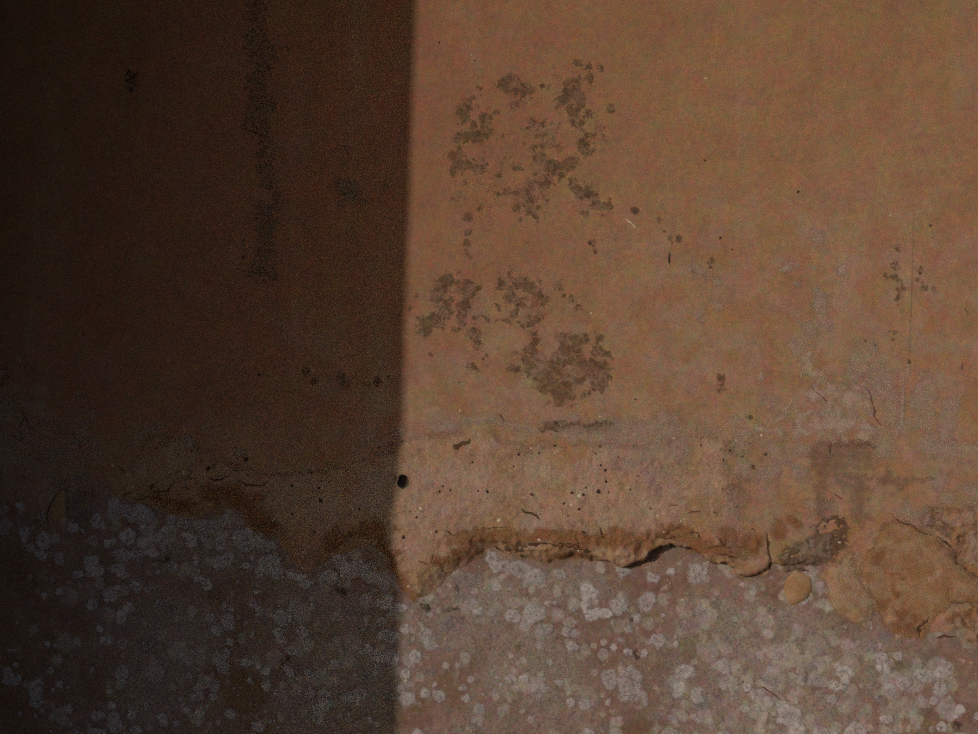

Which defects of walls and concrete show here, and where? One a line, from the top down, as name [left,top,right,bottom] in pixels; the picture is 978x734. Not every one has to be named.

spalling [779,515,848,571]
spalling [921,505,978,577]